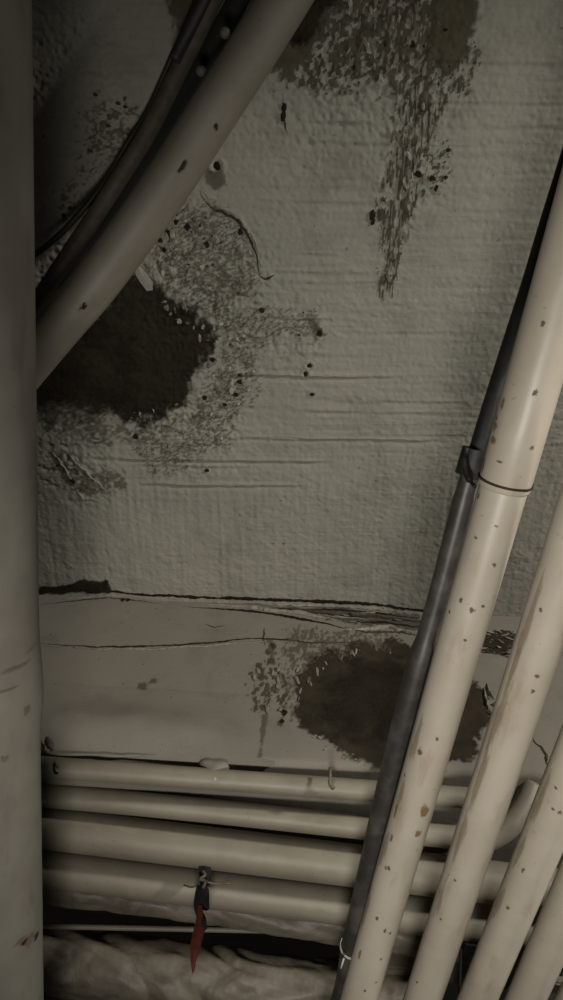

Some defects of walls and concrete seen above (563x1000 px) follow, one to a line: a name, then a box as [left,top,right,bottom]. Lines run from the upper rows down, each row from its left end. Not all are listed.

leakage [272,0,481,300]
crack [200,191,275,280]
leakage [36,275,228,442]
crack [41,590,423,650]
leakage [281,625,411,768]
leakage [449,680,495,762]